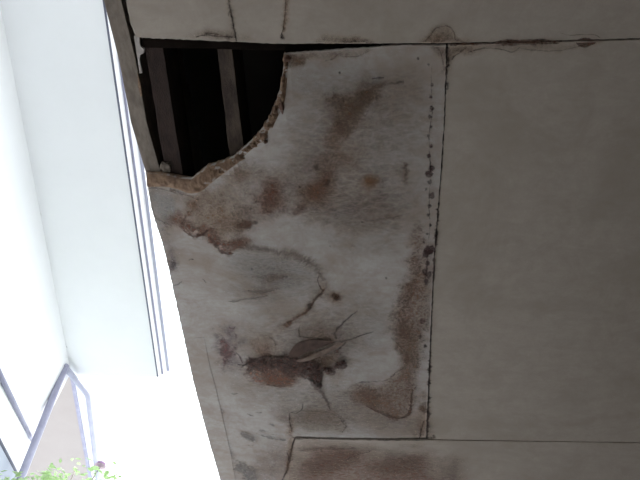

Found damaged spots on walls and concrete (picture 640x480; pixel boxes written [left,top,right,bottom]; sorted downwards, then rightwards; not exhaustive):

spalling [147,51,291,193]
water stain [425,106,434,226]
crack [284,272,325,327]
water stain [422,234,434,285]
peeling [238,312,372,409]